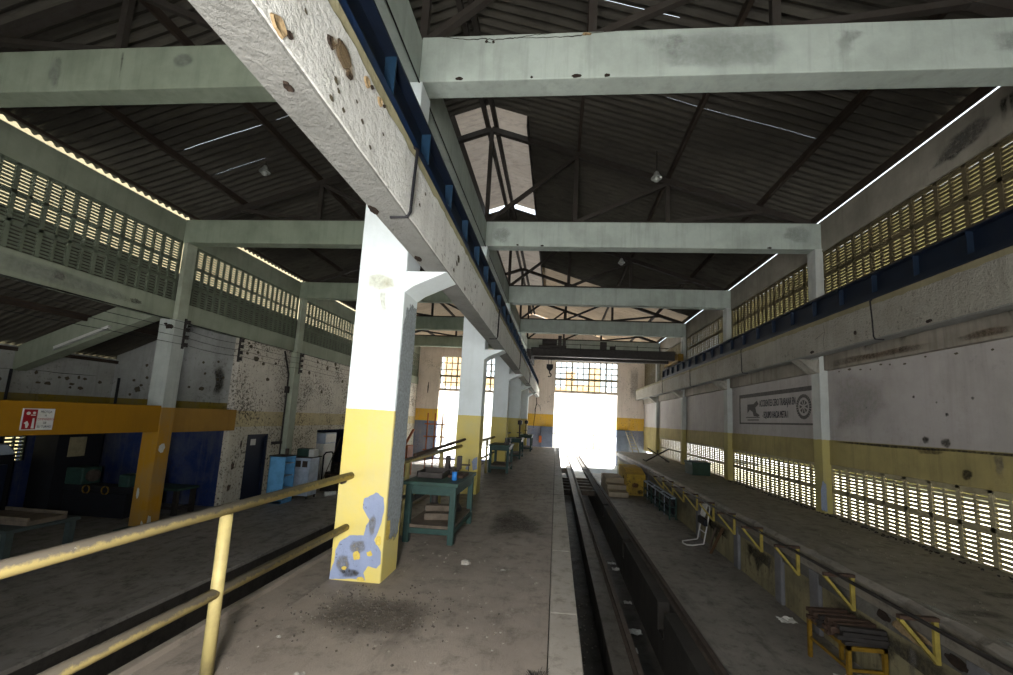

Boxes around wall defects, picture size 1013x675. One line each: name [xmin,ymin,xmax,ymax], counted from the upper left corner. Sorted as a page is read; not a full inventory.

peeling [329,305,417,581]